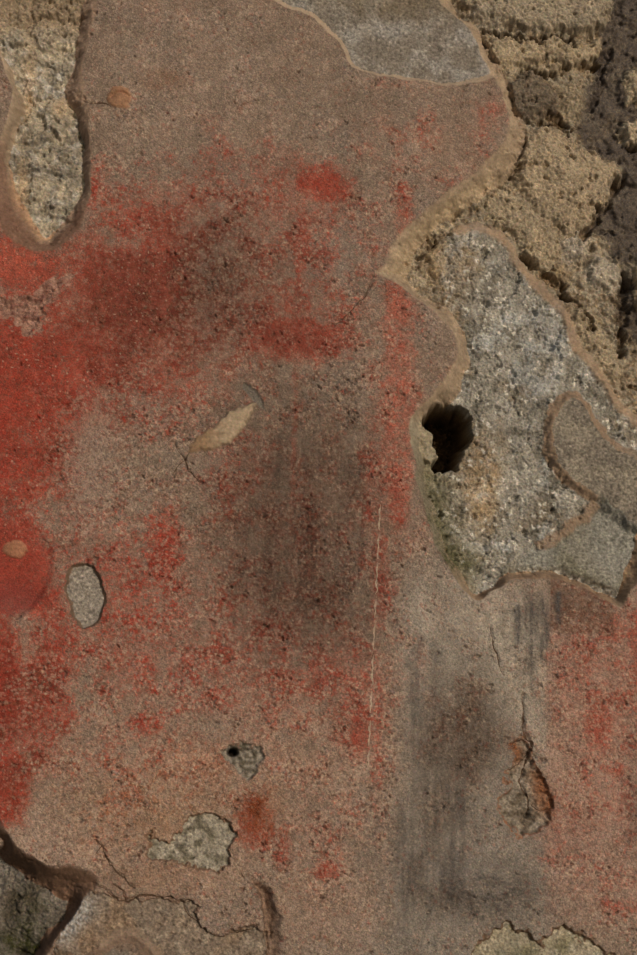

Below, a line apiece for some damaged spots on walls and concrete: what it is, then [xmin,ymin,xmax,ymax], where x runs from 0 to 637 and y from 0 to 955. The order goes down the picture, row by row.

spalling [0,0,99,254]
spalling [273,0,637,609]
peeling [0,510,53,618]
spalling [64,563,108,630]
spalling [219,740,266,784]
spalling [497,735,556,840]
spalling [0,812,284,955]
crack [93,839,198,922]
spalling [471,920,616,955]